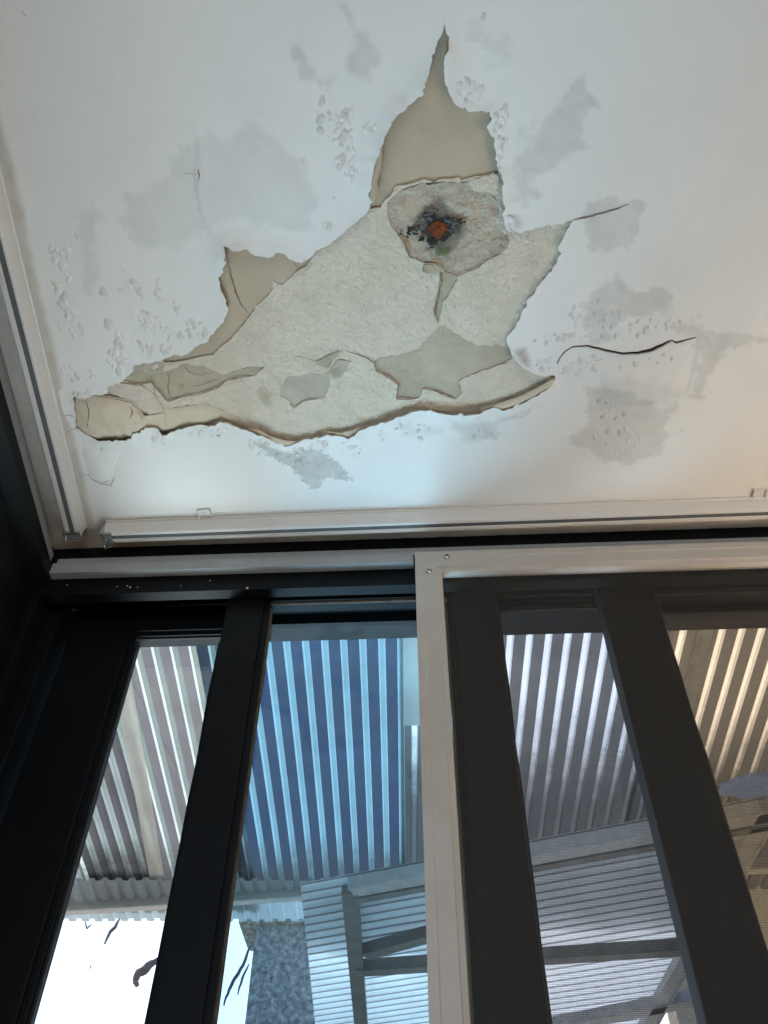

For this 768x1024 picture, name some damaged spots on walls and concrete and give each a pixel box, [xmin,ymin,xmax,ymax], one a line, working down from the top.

peeling [59,9,594,468]
corrosion [427,220,448,239]
crack [556,336,696,365]